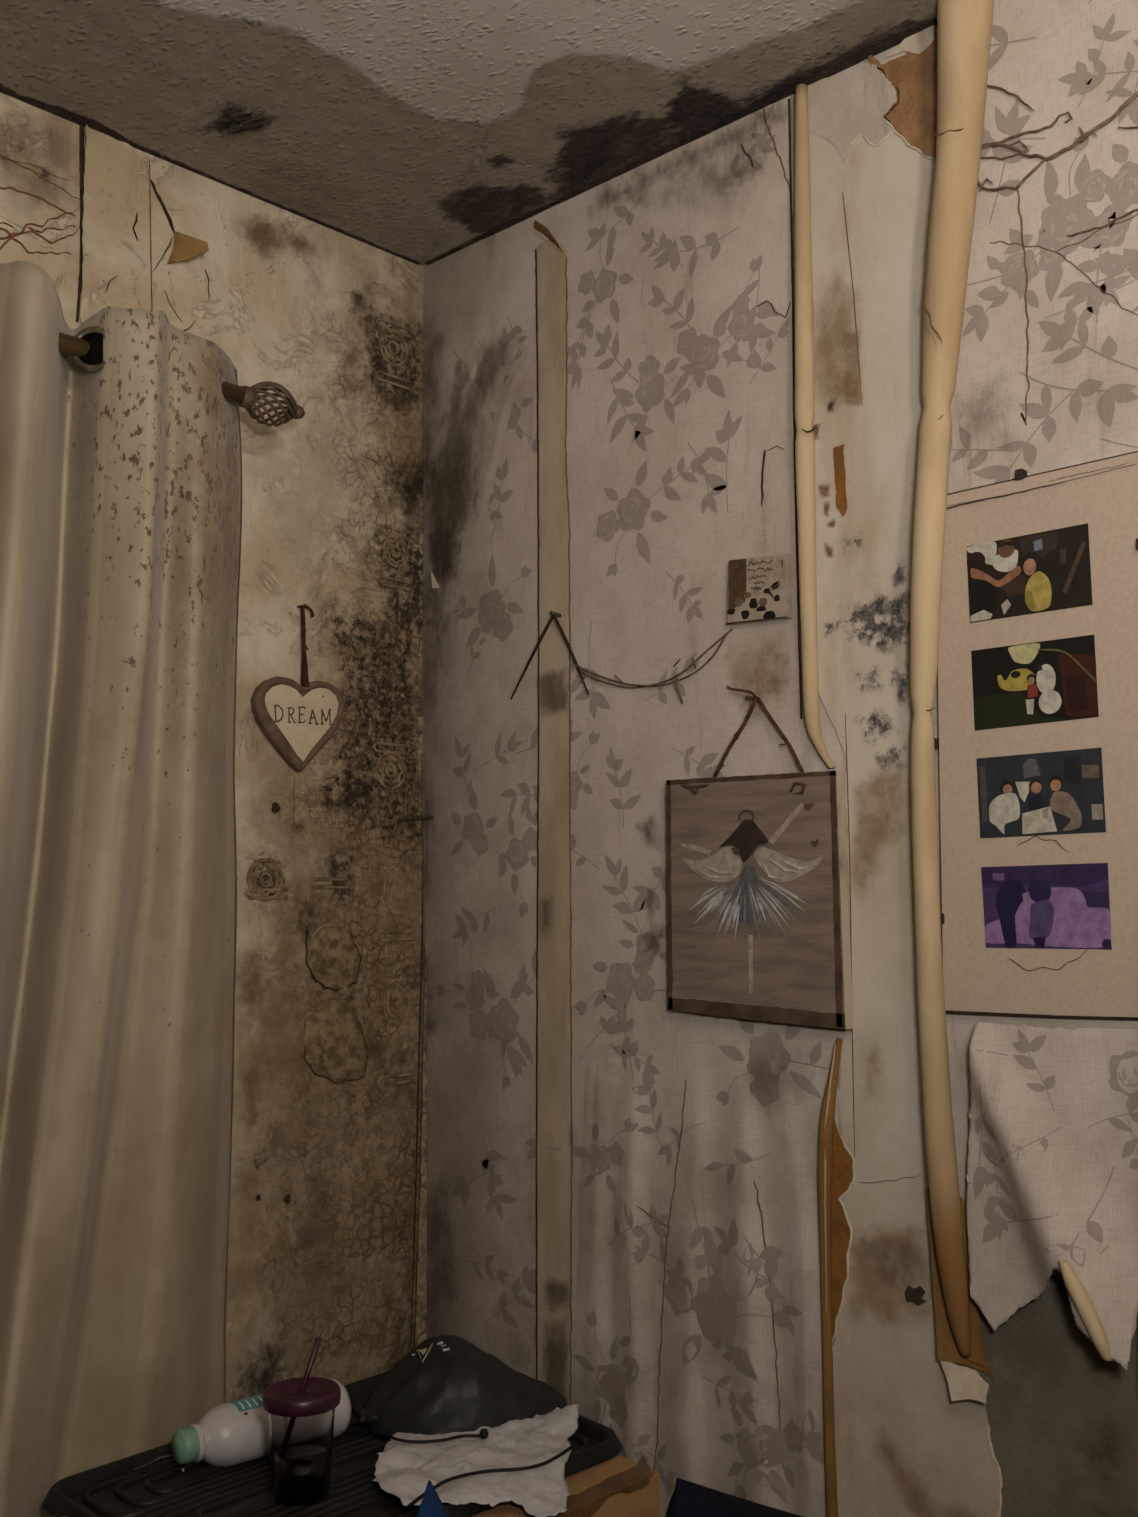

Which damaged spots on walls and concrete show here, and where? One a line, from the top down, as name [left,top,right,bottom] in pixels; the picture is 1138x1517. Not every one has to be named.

water stain [0,0,937,265]
crack [0,154,81,200]
peeling [76,124,209,323]
water stain [353,294,427,407]
water stain [321,403,472,842]
water stain [827,567,910,651]
water stain [865,714,891,735]
water stain [863,664,908,701]
peeling [807,25,1138,1517]
water stain [325,852,354,900]
water stain [239,1346,281,1398]